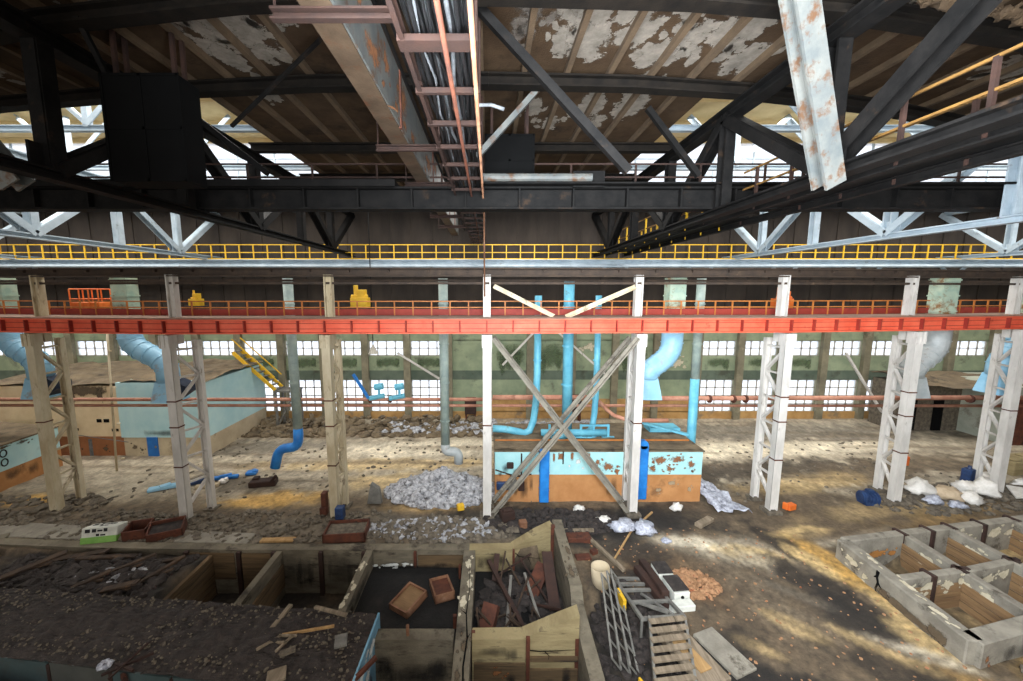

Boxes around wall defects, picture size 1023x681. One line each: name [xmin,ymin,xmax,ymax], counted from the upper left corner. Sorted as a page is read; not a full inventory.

spalling [909,0,957,12]
spalling [987,2,1023,29]
peeling [171,14,299,77]
peeling [511,8,786,77]
peeling [578,93,651,128]
corrosion [648,453,695,474]